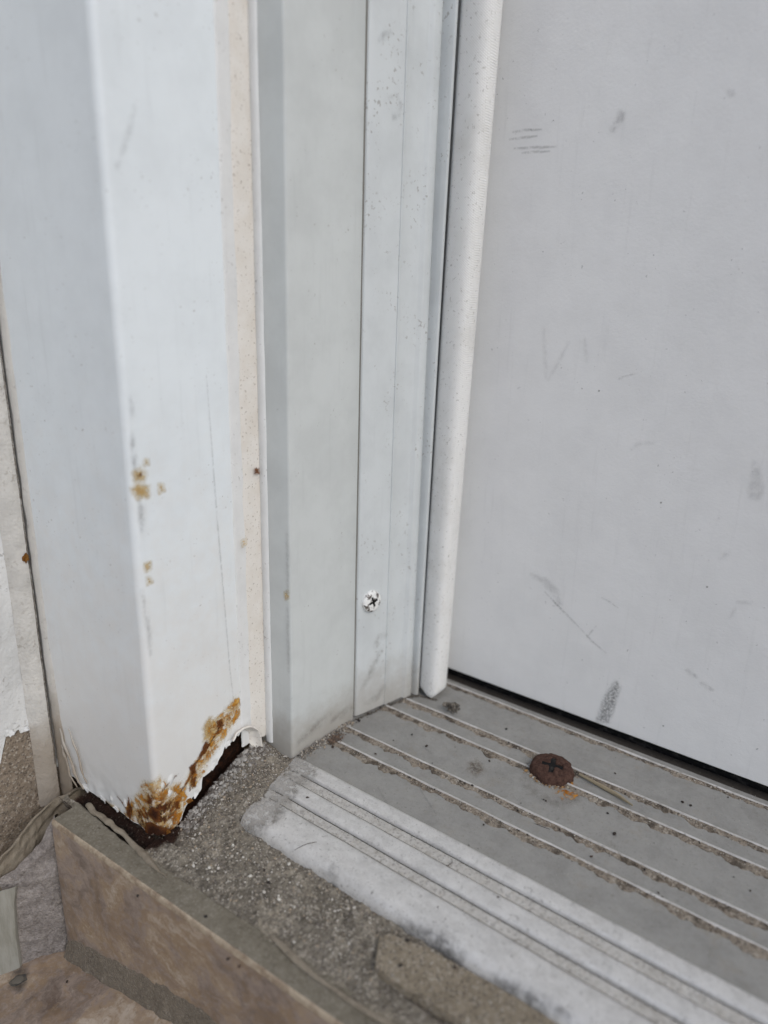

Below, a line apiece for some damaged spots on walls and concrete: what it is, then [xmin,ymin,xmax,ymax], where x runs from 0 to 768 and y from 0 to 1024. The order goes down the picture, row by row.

rust [133,462,148,497]
rust [64,698,244,850]